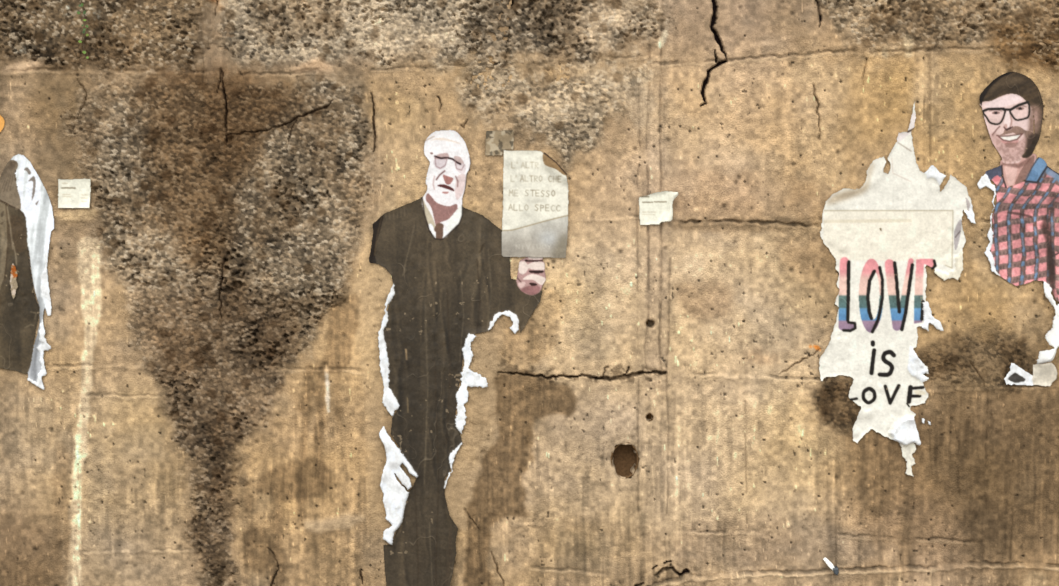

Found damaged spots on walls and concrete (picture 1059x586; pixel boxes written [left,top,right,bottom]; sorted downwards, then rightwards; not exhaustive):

crack [699,0,728,107]
water stain [202,286,368,586]
water stain [455,275,586,586]
water stain [845,363,1059,586]